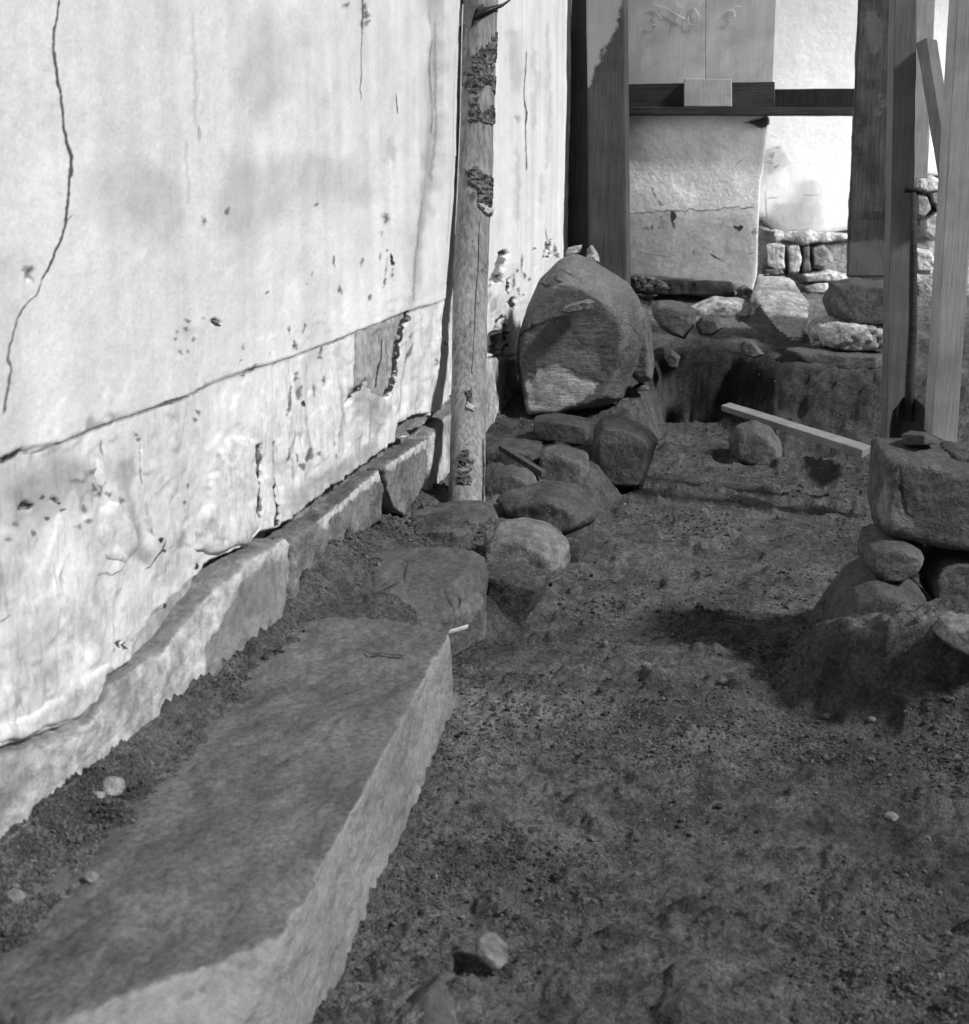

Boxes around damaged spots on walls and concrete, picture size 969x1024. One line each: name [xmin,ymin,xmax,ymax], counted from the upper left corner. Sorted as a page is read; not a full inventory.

crack [3,0,73,414]
crack [630,197,779,230]
crack [0,304,433,461]
flaking render [345,312,413,402]
flaking render [288,448,321,470]